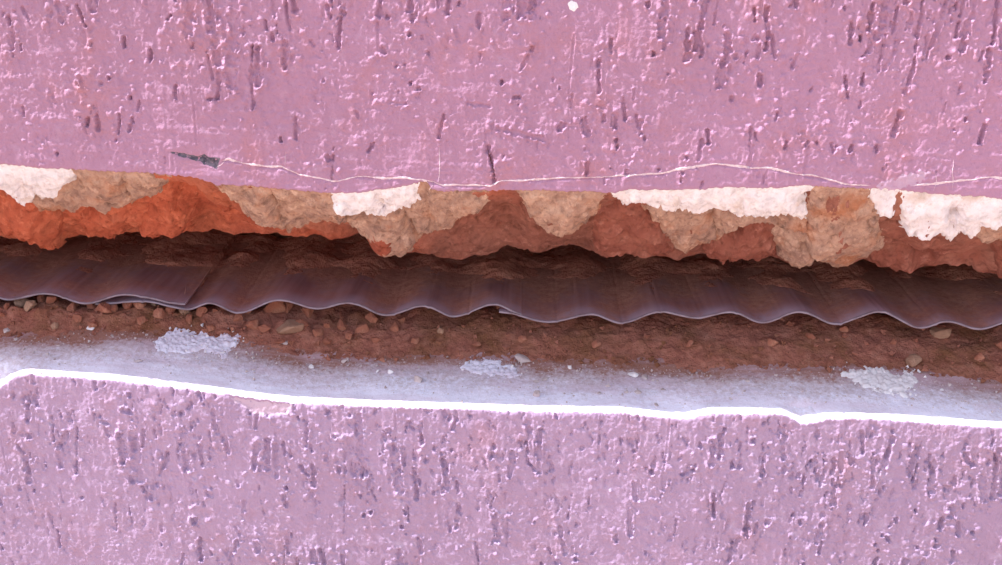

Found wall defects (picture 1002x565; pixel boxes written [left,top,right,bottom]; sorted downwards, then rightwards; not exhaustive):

spalling [0,164,172,215]
spalling [171,152,220,169]
crack [213,147,869,190]
crack [913,161,1002,188]
spalling [215,181,490,258]
spalling [515,185,1002,269]